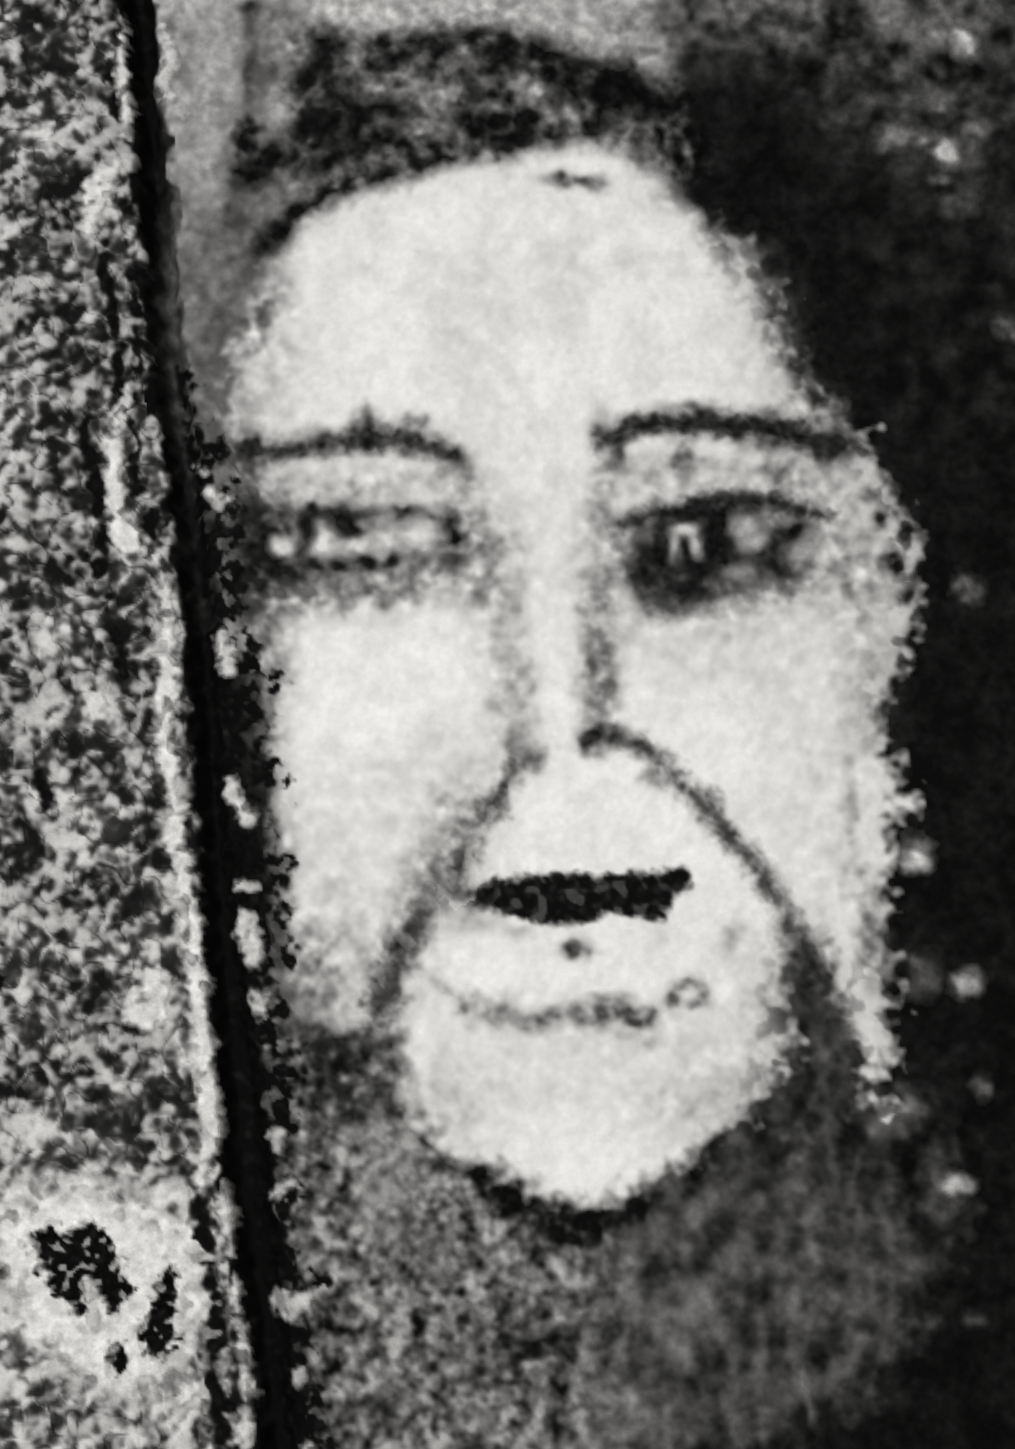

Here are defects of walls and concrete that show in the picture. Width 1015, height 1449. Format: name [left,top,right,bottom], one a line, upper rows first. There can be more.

spalling [77,159,121,235]
spalling [113,17,134,138]
spalling [102,384,146,556]
crack [77,0,337,1449]
spalling [122,573,224,1187]
spalling [0,1170,255,1449]